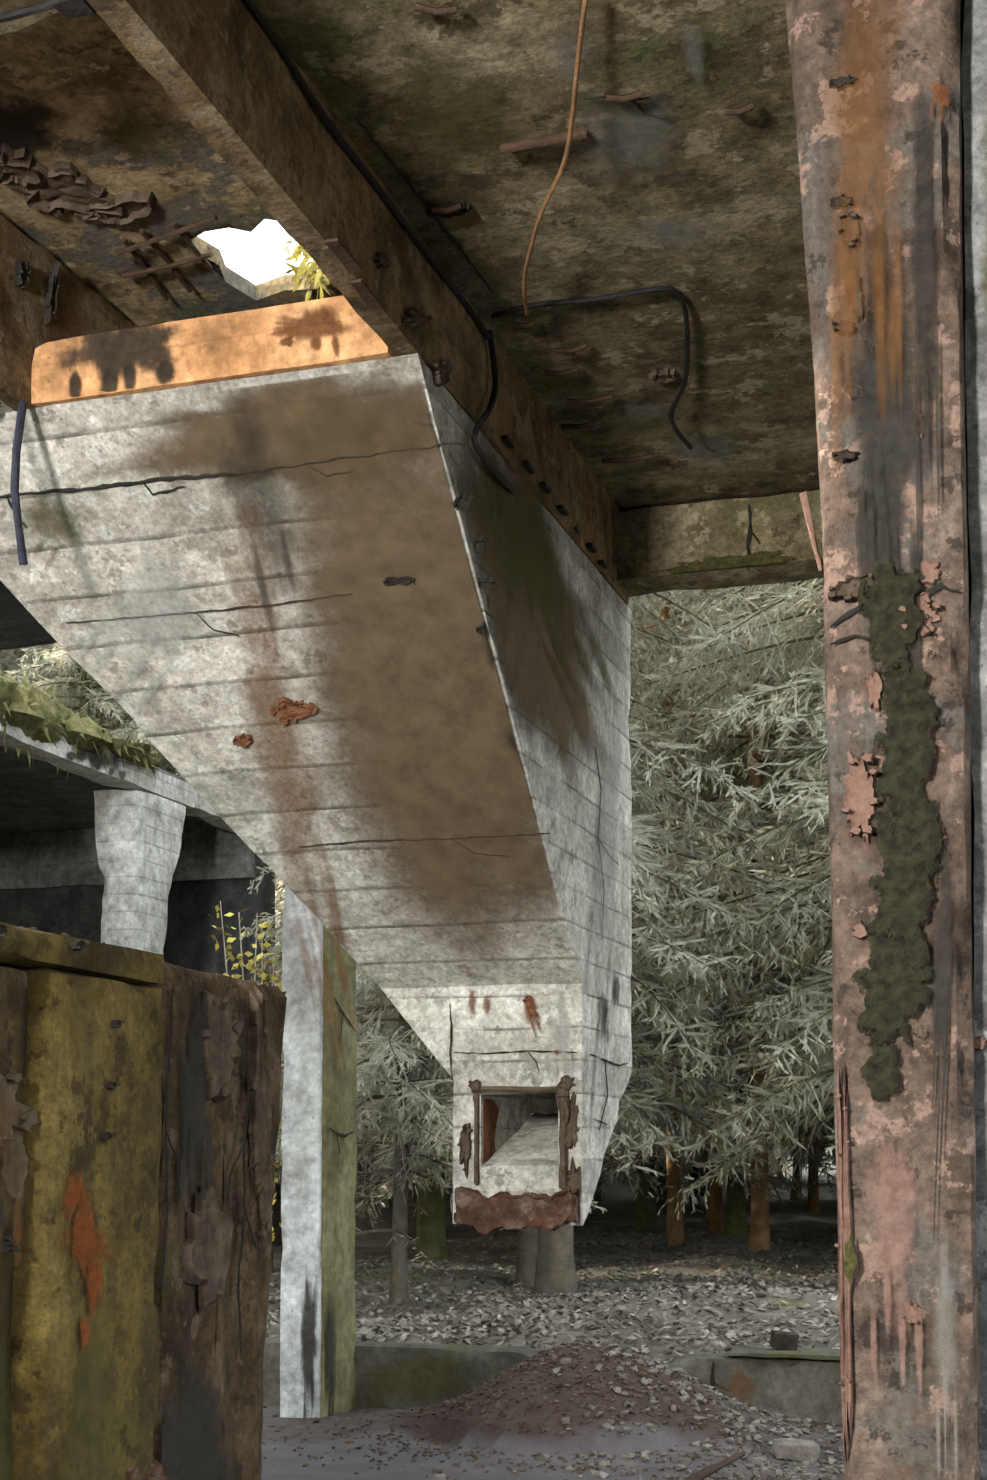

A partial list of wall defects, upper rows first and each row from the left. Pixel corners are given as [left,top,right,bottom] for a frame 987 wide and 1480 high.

rust [272,308,342,354]
water stain [130,375,612,950]
peeling [865,670,884,712]
water stain [67,745,126,779]
peeling [842,750,879,844]
peeling [850,920,869,940]
peeling [0,1073,40,1204]
rust [63,1174,113,1349]